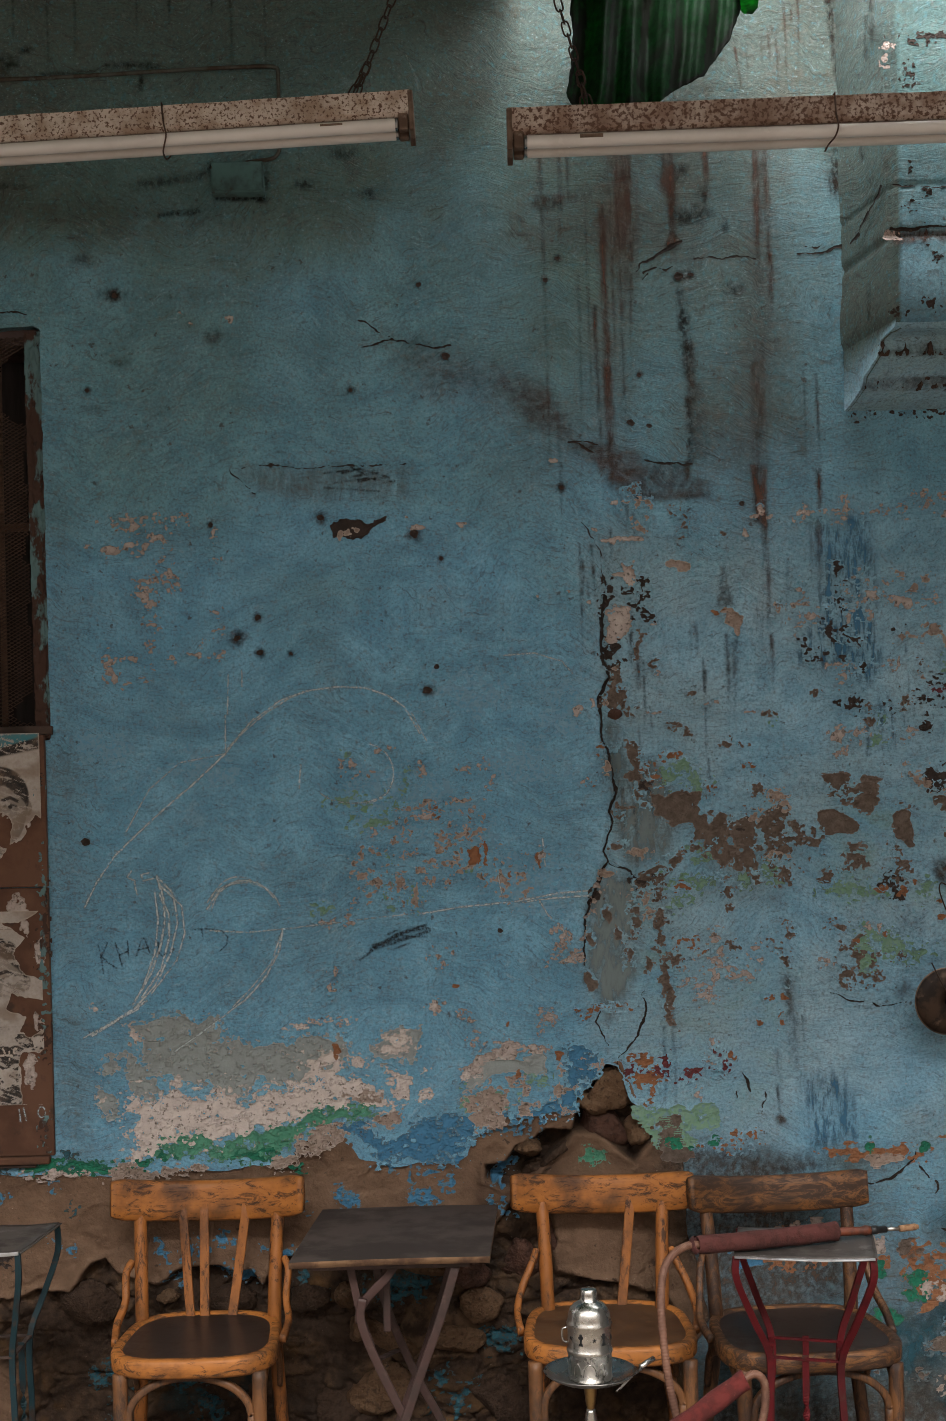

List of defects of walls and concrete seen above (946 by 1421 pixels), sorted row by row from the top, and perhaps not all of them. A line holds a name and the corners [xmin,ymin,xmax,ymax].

crack [797,184,946,255]
crack [636,240,756,280]
rust [588,155,637,485]
rust [751,466,767,539]
crack [581,522,637,966]
flaking render [0,481,946,1421]
crack [595,991,647,1064]